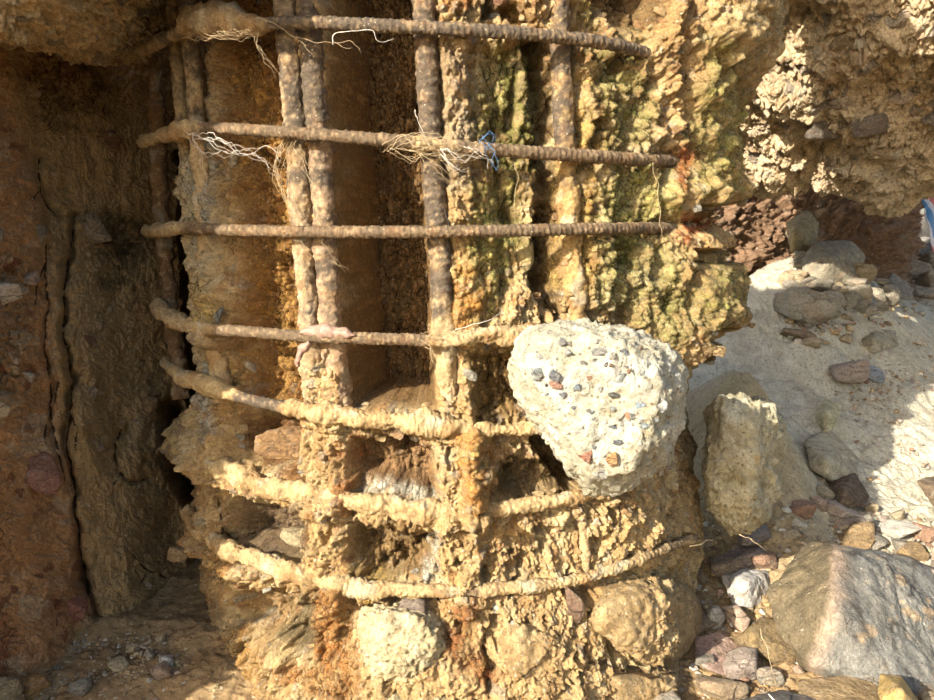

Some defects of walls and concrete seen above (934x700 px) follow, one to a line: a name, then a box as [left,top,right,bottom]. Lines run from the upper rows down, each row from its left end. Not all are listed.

spalling [328,30,419,136]
rust [575,80,603,149]
rust [221,136,291,226]
spalling [333,142,426,226]
leakage [506,178,521,207]
rust [242,236,299,330]
spalling [338,238,432,334]
leakage [607,235,656,292]
rust [228,338,301,400]
spalling [463,348,521,416]
crack [521,626,558,678]
crack [582,620,676,700]